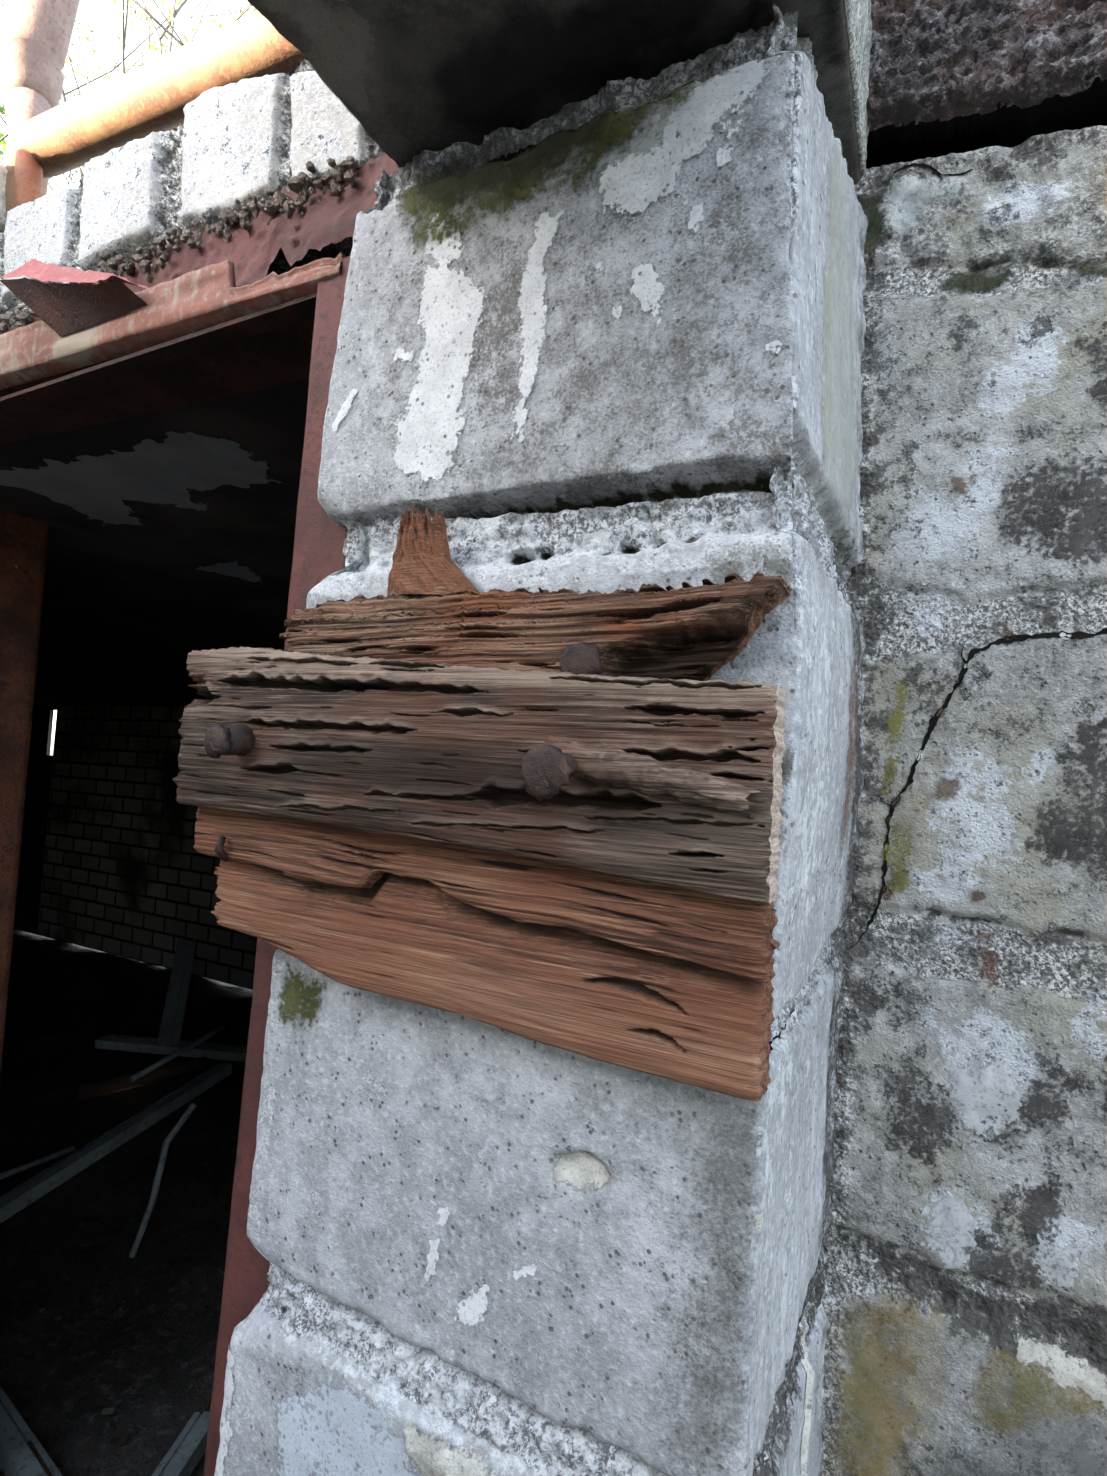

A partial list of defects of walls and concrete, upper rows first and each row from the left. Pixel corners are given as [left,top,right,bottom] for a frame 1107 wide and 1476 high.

peeling [598,59,770,233]
peeling [510,209,565,442]
peeling [612,263,669,327]
peeling [765,340,782,354]
peeling [0,431,284,527]
peeling [195,560,262,584]
crack [849,625,1107,948]